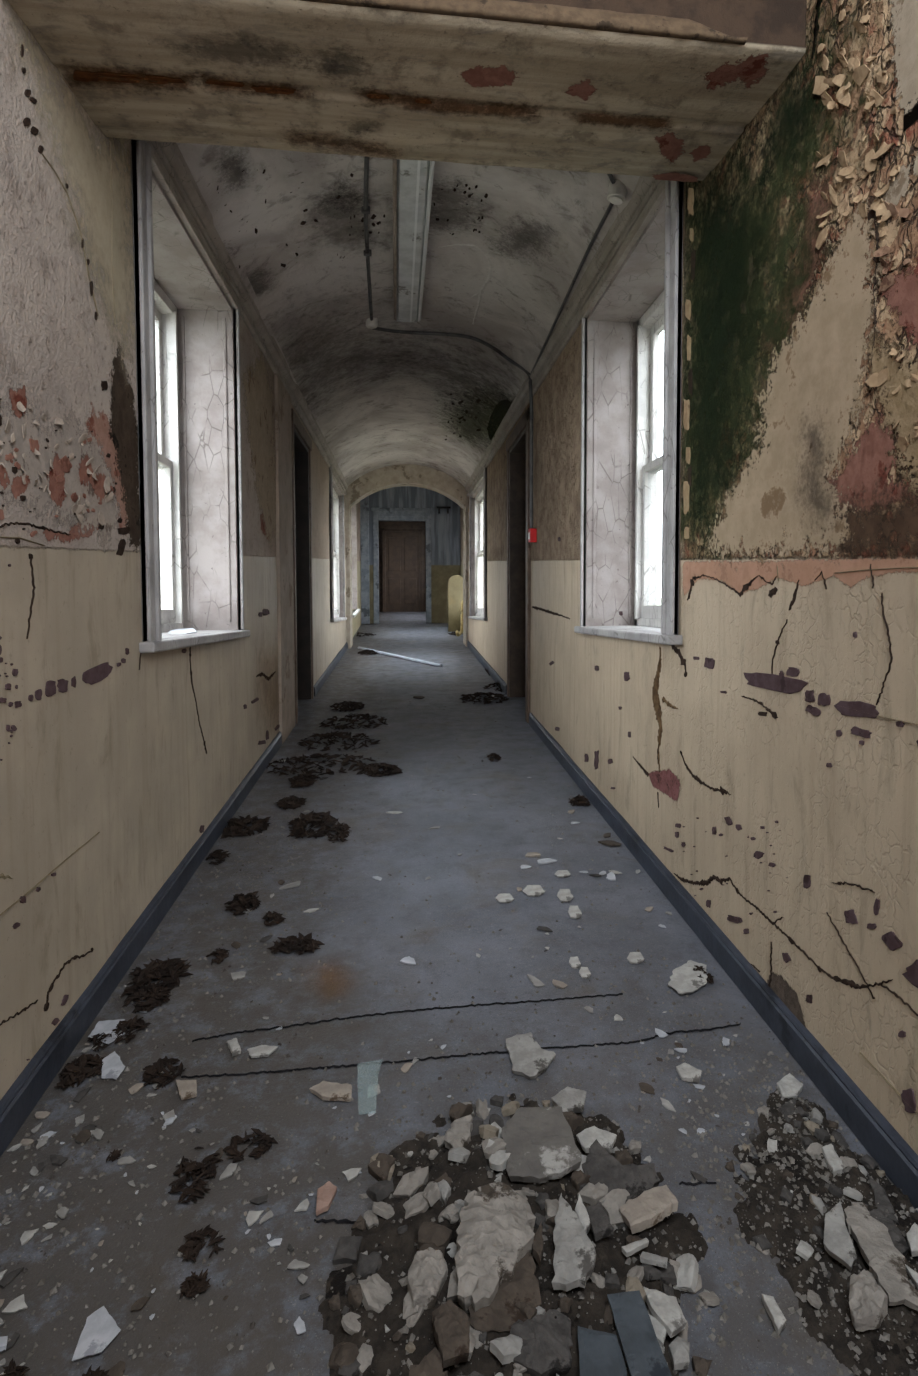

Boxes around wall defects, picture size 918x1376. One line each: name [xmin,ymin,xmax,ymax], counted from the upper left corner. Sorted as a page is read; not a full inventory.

peeling [813,0,918,115]
crack [903,98,918,132]
damp [433,184,488,235]
peeling [652,132,711,281]
damp [681,0,876,560]
damp [439,387,513,450]
peeling [682,133,918,610]
crack [0,522,71,639]
crack [741,619,788,719]
crack [674,873,918,1016]
crack [181,1051,508,1078]
crack [192,993,623,1042]